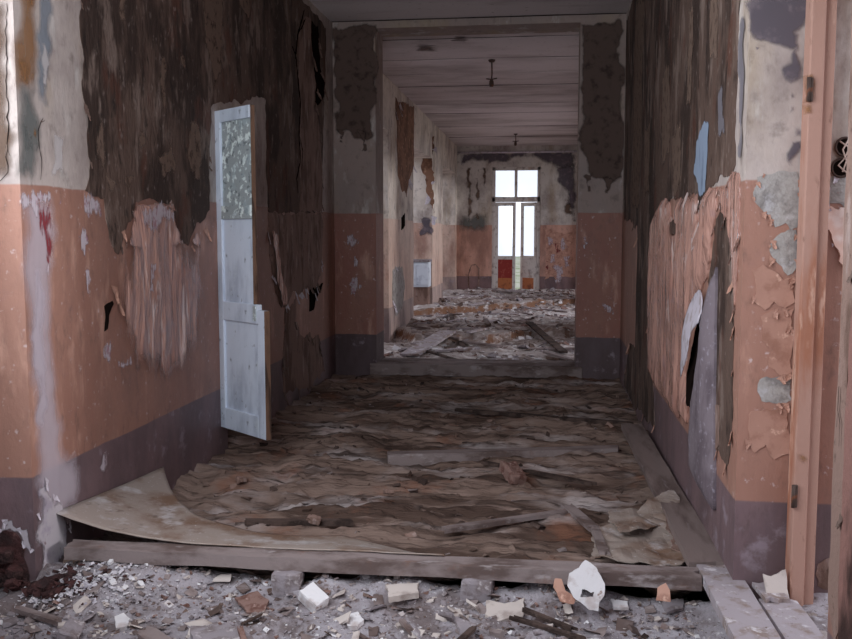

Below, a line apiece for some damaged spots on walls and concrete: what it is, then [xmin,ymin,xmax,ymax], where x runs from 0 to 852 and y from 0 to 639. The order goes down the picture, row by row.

leakage [39,205,52,263]
flaking render [79,0,329,405]
flaking render [395,98,437,225]
flaking render [623,0,744,433]
flaking render [751,171,799,317]
leakage [33,287,44,378]
flaking render [680,212,734,476]
peeling [745,373,792,460]
flaking render [0,477,72,583]